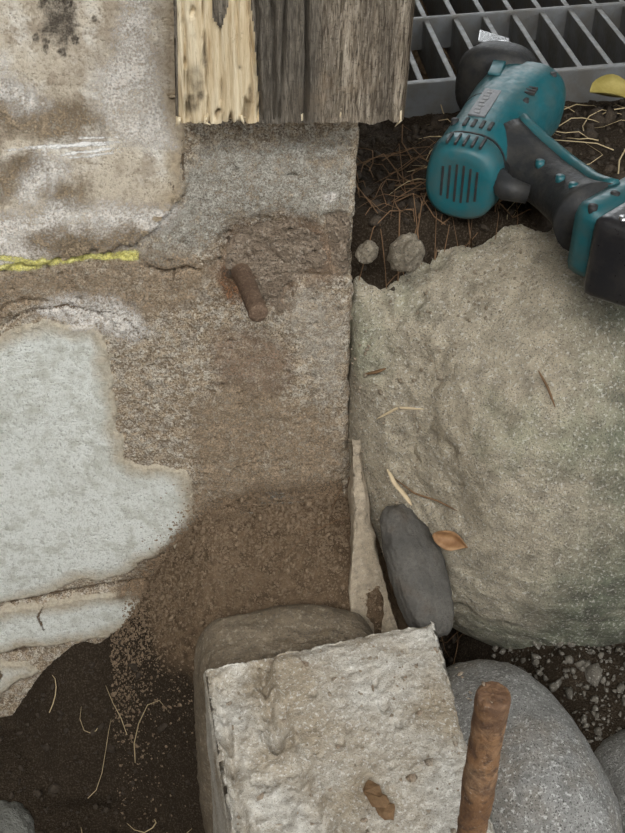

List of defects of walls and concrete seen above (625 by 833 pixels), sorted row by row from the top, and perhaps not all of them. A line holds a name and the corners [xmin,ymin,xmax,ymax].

leakage [0,0,350,266]